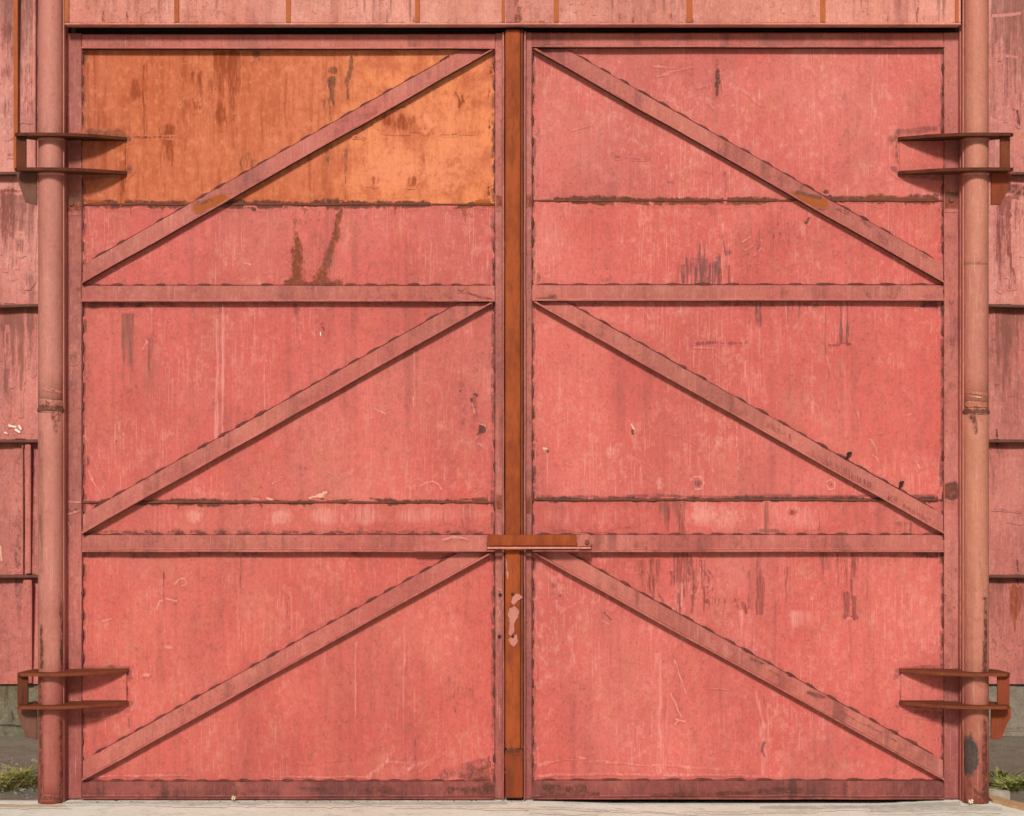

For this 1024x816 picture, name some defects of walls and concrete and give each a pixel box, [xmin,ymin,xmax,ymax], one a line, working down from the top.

rust [83,50,439,286]
rust [453,196,494,225]
peeling [497,560,523,647]